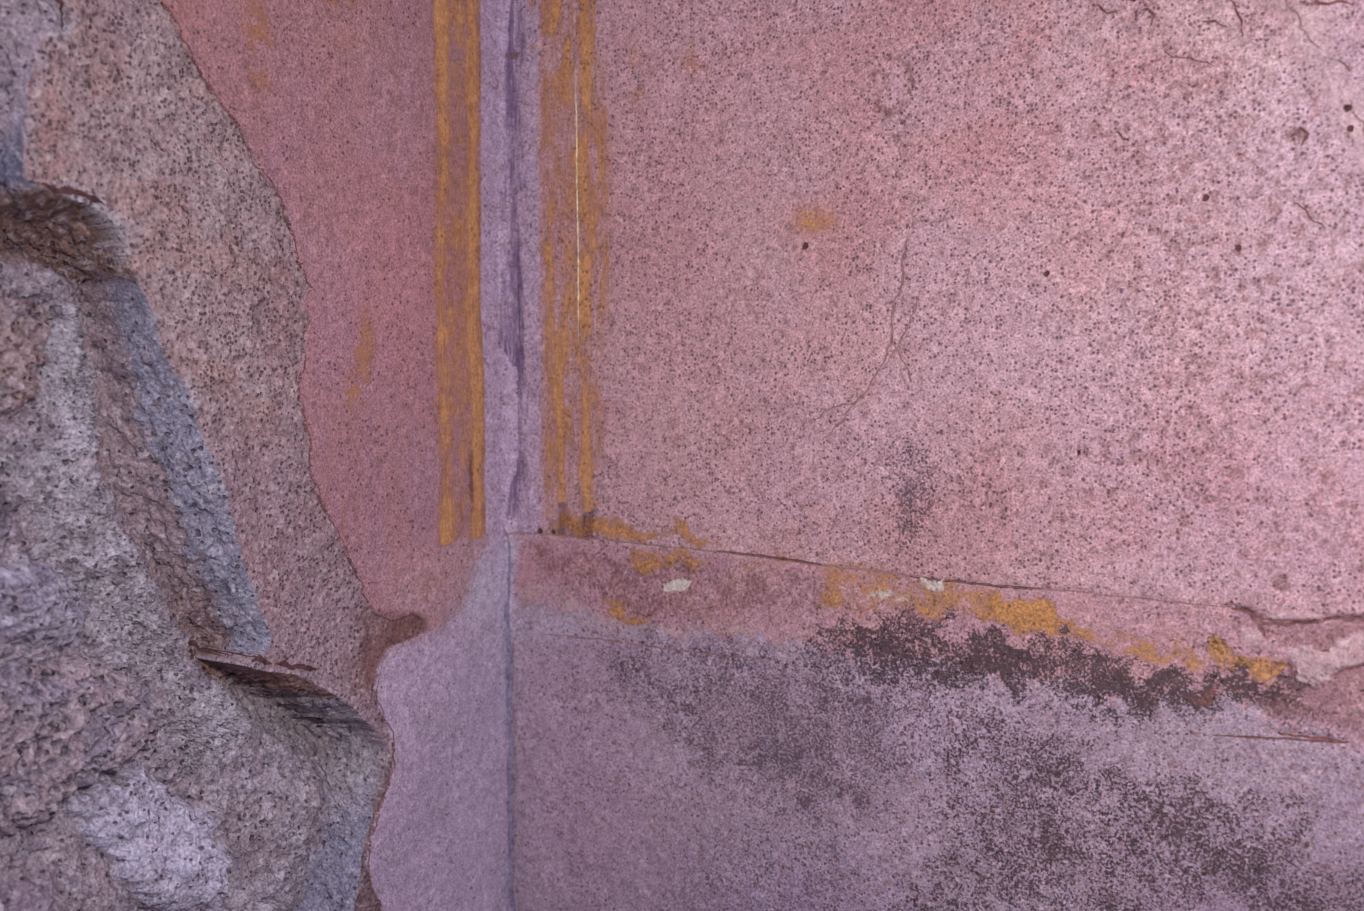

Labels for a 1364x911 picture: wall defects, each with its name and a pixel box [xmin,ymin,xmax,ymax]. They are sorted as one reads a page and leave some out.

crack [1286,0,1325,50]
crack [1349,99,1364,134]
flaking render [0,0,428,911]
crack [503,526,1364,911]
water stain [555,561,1364,911]
flaking render [1231,607,1364,743]